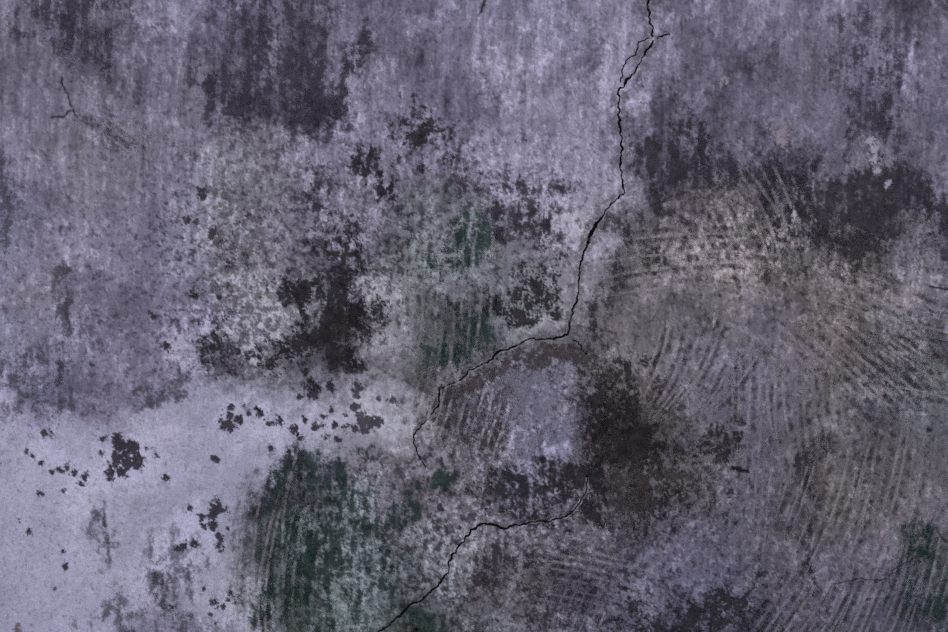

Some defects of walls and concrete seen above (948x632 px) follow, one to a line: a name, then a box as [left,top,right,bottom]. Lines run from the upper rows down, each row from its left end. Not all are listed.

water stain [346,94,581,333]
crack [411,0,669,467]
water stain [424,15,948,540]
crack [376,477,589,632]